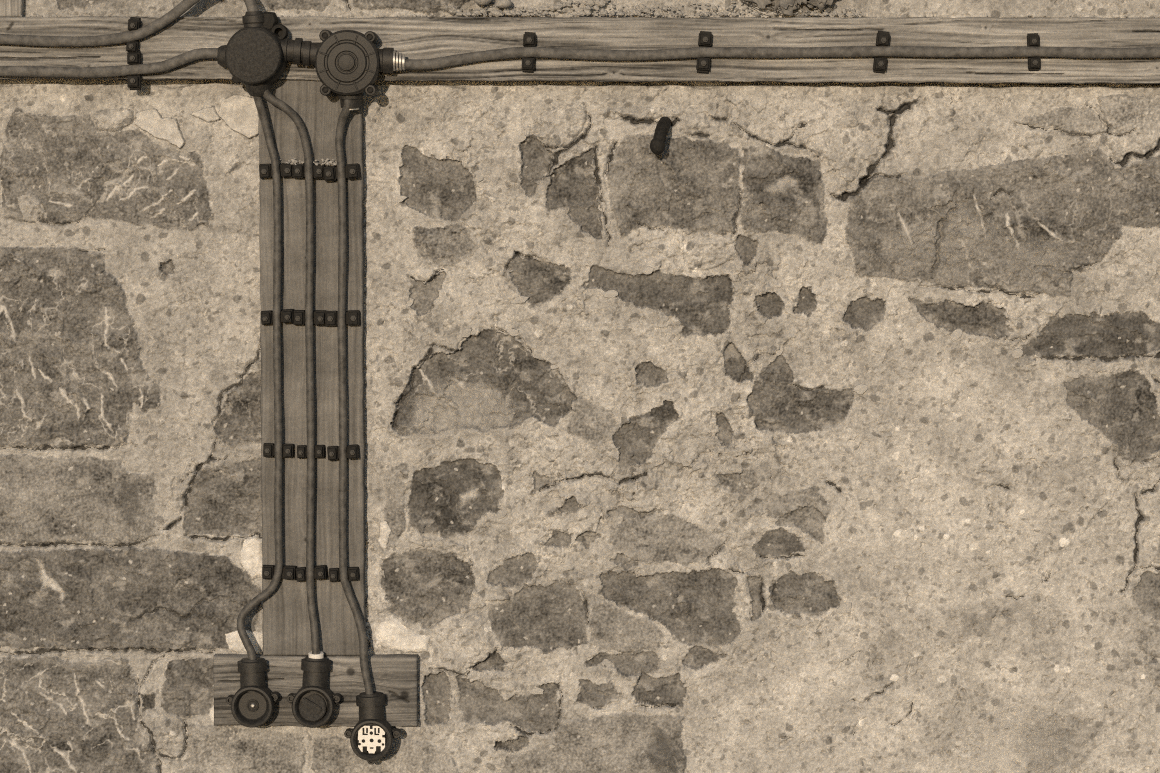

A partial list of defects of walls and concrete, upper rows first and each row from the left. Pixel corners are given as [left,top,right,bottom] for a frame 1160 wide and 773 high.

spalling [391,145,484,221]
spalling [513,135,606,239]
crack [833,100,918,201]
crack [1023,105,1160,167]
crack [0,345,262,548]
spalling [390,328,577,436]
spalling [612,361,681,470]
spalling [506,254,868,434]
spalling [836,297,886,332]
spalling [909,298,1160,465]
crack [1114,456,1160,593]
spalling [380,458,852,753]